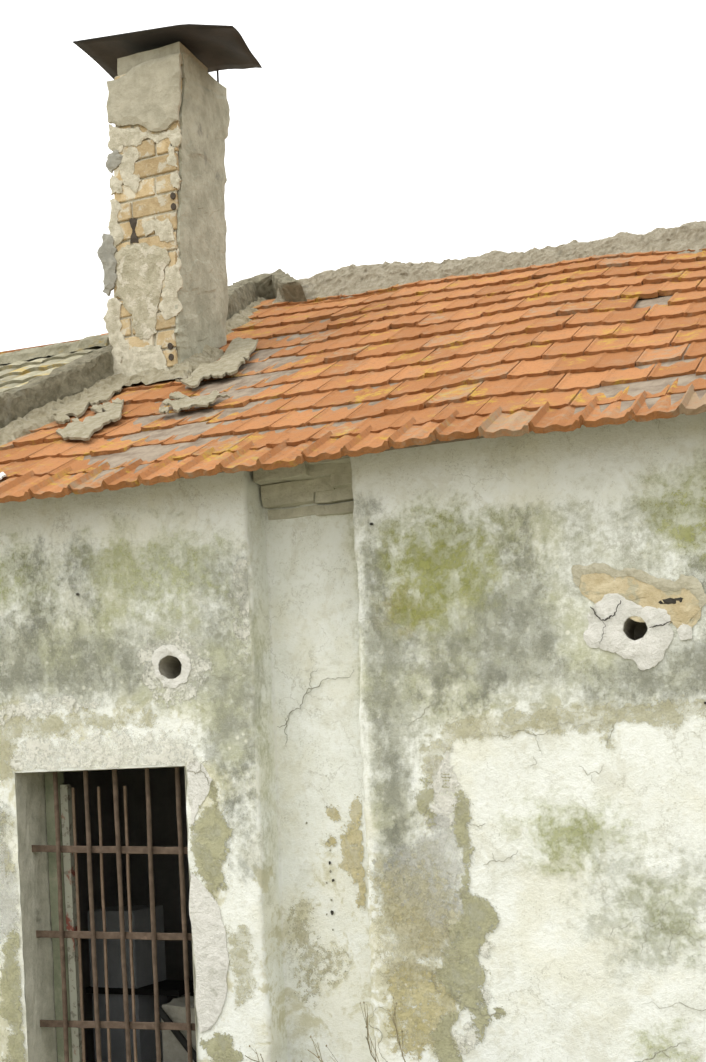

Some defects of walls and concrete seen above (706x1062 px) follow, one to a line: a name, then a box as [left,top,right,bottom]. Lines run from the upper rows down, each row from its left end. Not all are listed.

flaking render [106,150,123,173]
flaking render [97,233,171,340]
flaking render [53,385,124,441]
flaking render [159,337,258,414]
spalling [571,563,706,640]
damp [0,694,101,727]
damp [9,728,197,770]
damp [136,630,212,708]
crack [277,669,354,742]
damp [372,695,706,932]
flaking render [186,760,254,1062]
peeling [325,773,506,1062]